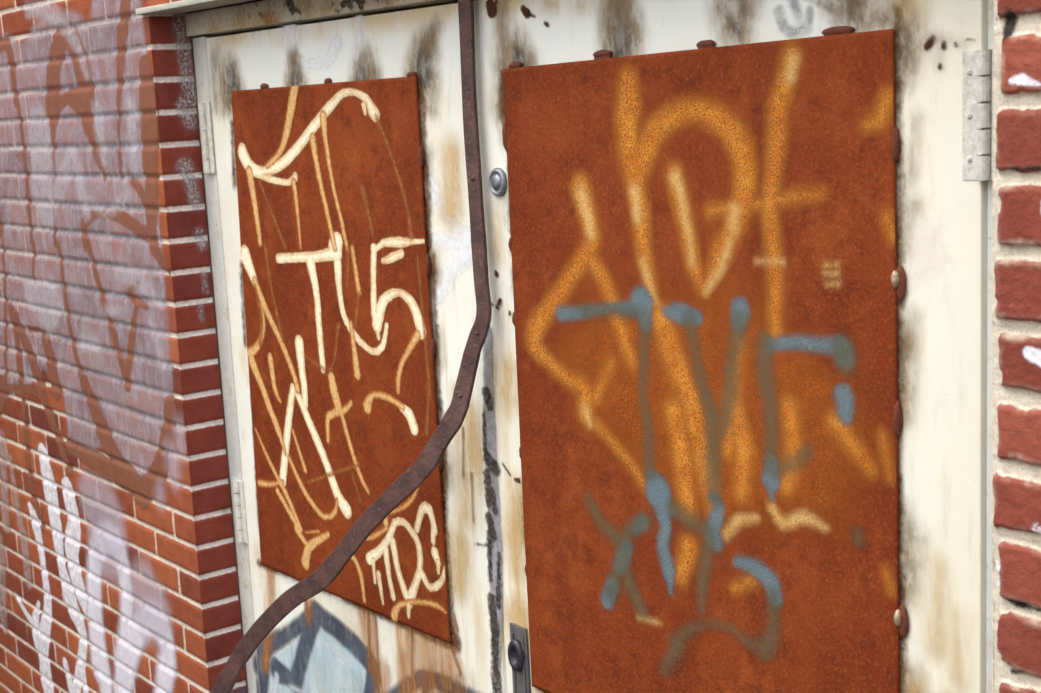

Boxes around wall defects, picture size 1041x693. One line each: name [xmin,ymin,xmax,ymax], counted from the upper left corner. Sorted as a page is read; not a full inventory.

rust [521,5,548,27]
rust [286,58,303,87]
rust [486,0,535,125]
rust [444,148,457,218]
rust [406,28,442,425]
rust [257,560,285,604]
rust [330,407,480,693]
peeling [476,327,503,693]
rust [509,499,524,569]